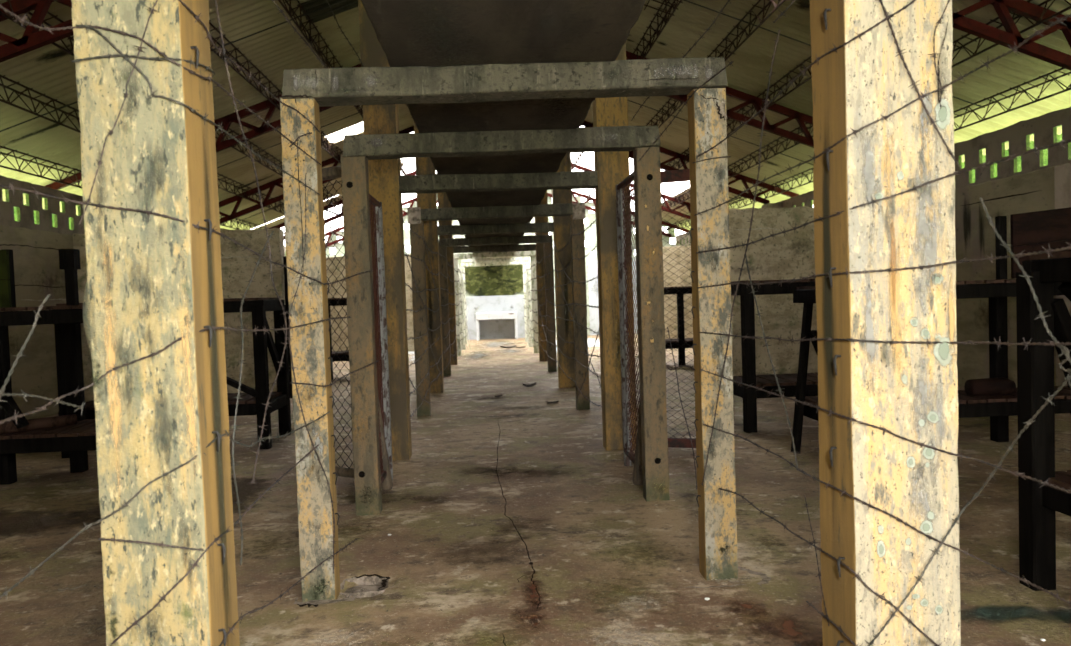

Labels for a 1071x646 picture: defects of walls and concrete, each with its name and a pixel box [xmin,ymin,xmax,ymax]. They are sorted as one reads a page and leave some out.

leakage [132,278,151,298]
leakage [883,251,902,365]
leakage [153,399,171,463]
leakage [182,322,196,451]
crack [496,424,541,610]
leakage [146,618,157,638]